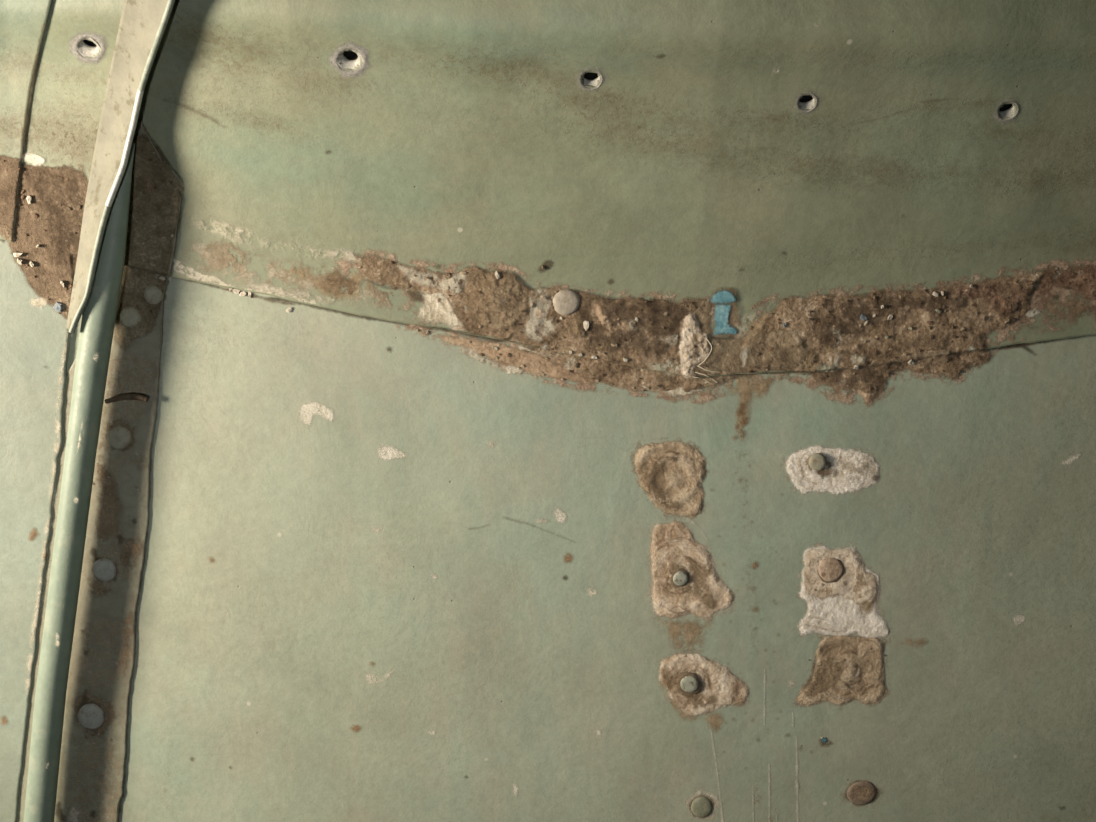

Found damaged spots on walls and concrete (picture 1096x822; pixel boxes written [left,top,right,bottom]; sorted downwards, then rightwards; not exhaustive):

peeling [22,153,44,166]
peeling [159,221,425,312]
peeling [398,323,734,404]
rust [315,255,1096,438]
peeling [703,260,1096,406]